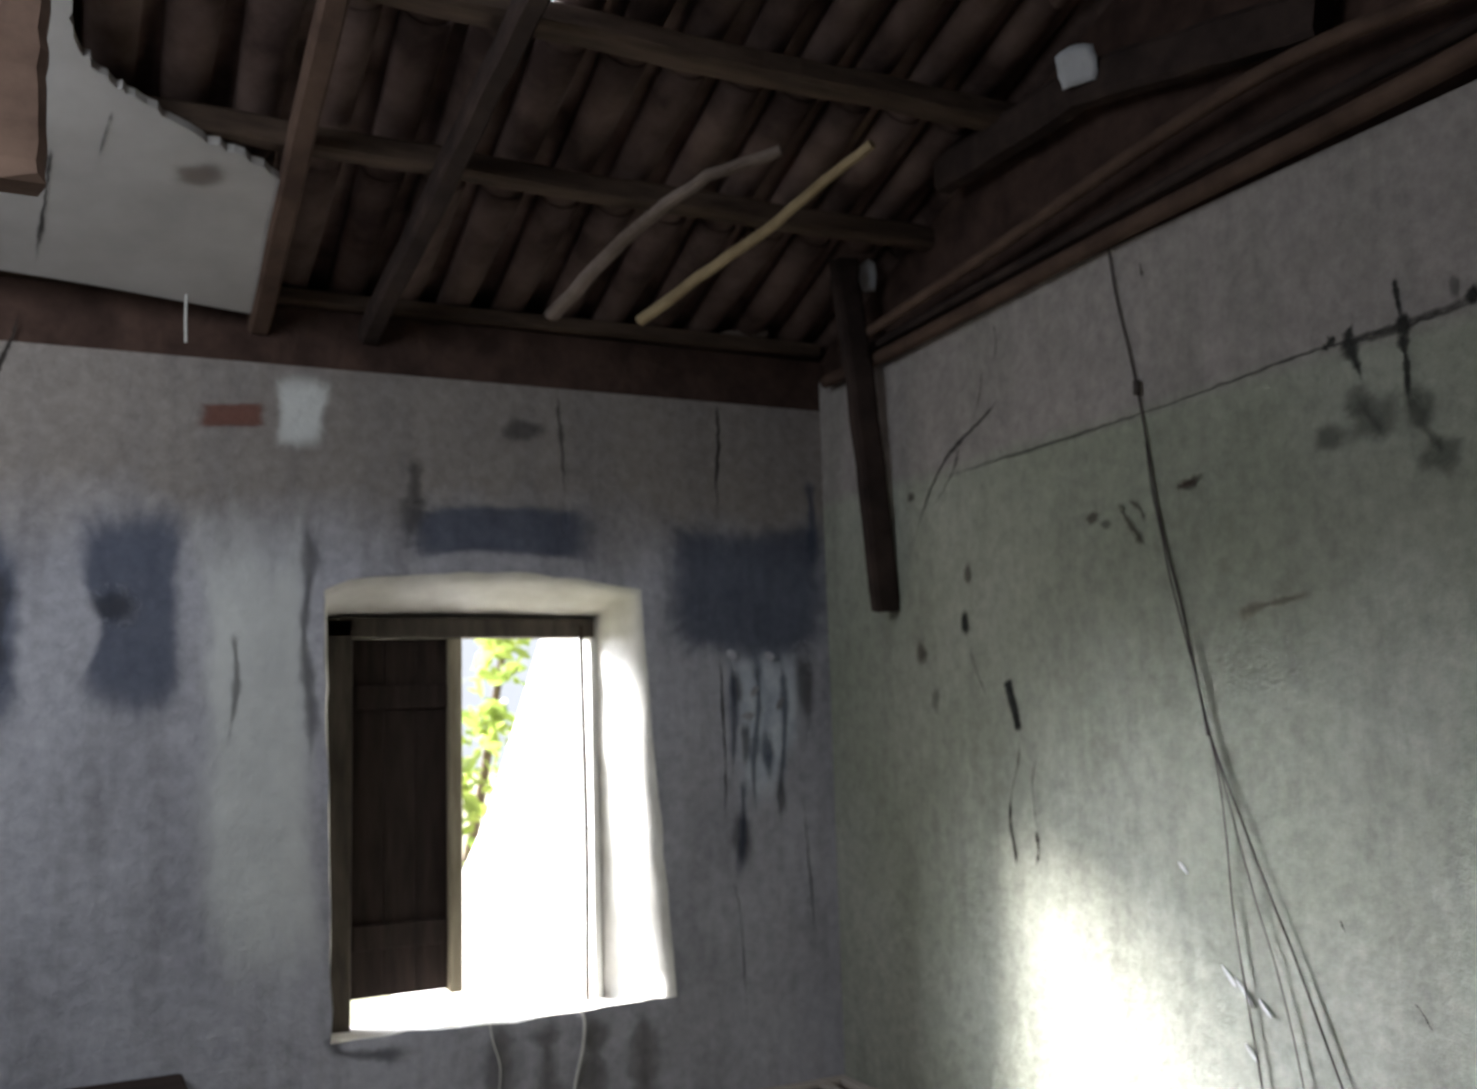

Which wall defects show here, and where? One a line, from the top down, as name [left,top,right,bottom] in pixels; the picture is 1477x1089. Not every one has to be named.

spalling [553,0,607,12]
crack [0,321,17,367]
crack [909,327,996,525]
crack [1000,299,1469,459]
water stain [1323,327,1360,374]
water stain [1392,280,1410,394]
water stain [1465,285,1477,303]
water stain [0,559,11,696]
water stain [89,528,174,698]
water stain [683,488,814,650]